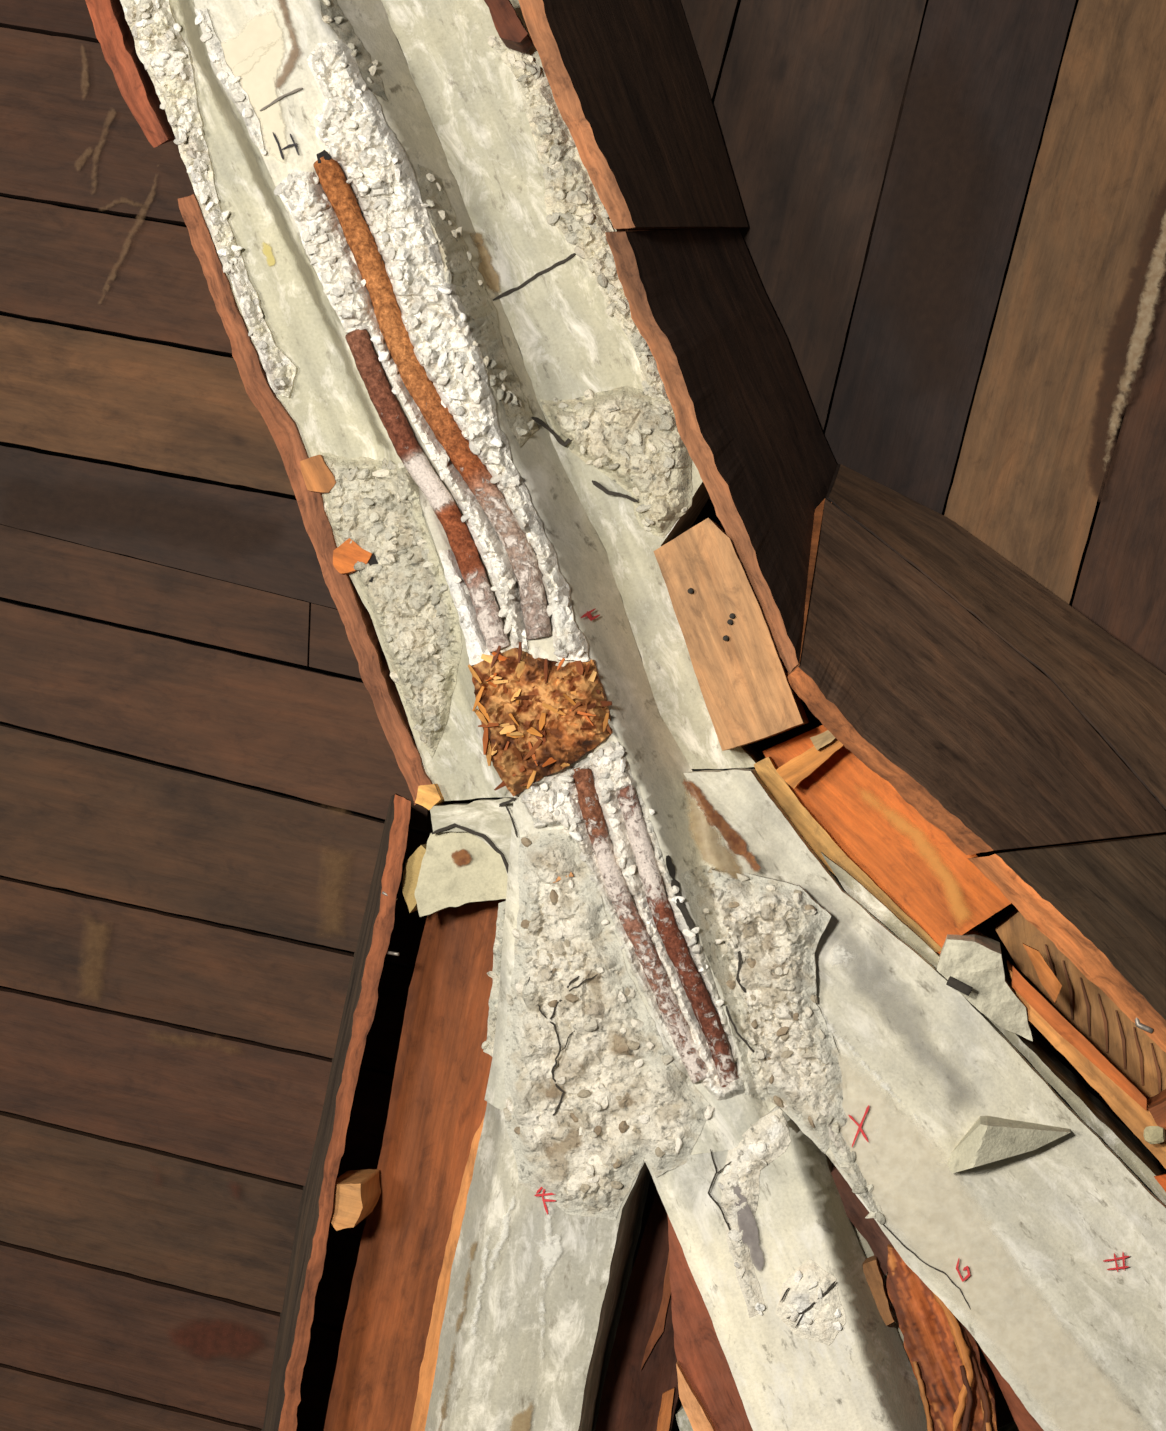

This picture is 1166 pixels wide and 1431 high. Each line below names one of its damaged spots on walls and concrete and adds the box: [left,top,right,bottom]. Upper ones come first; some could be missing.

spalling [127,0,267,155]
peeling [160,98,207,176]
peeling [199,193,243,273]
peeling [240,295,268,349]
spalling [274,0,693,662]
spalling [319,451,491,758]
crack [432,798,518,873]
corrosion [683,779,761,871]
spalling [482,741,888,1345]
crack [883,1224,971,1310]